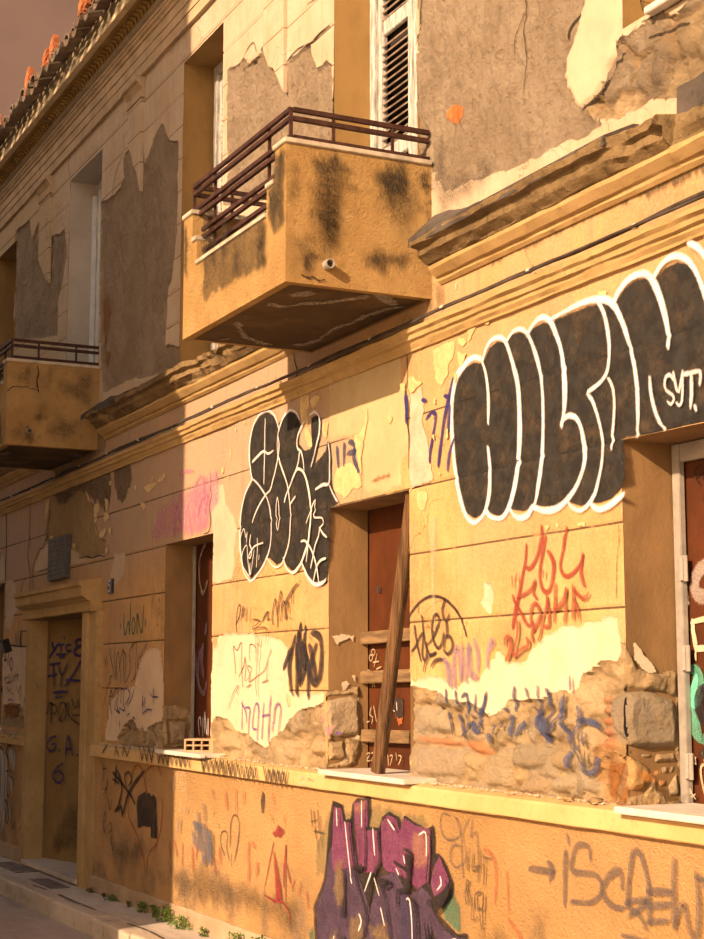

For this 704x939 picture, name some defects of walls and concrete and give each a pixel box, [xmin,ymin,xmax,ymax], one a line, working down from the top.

flaking render [100,123,180,393]
water stain [203,151,285,299]
flaking render [223,44,334,206]
water stain [304,155,348,270]
water stain [371,252,404,271]
water stain [381,162,408,218]
flaking render [416,0,704,192]
crack [581,45,625,113]
crack [640,0,690,39]
peeling [105,648,191,750]
peeling [211,632,362,769]
flaking render [409,616,681,806]